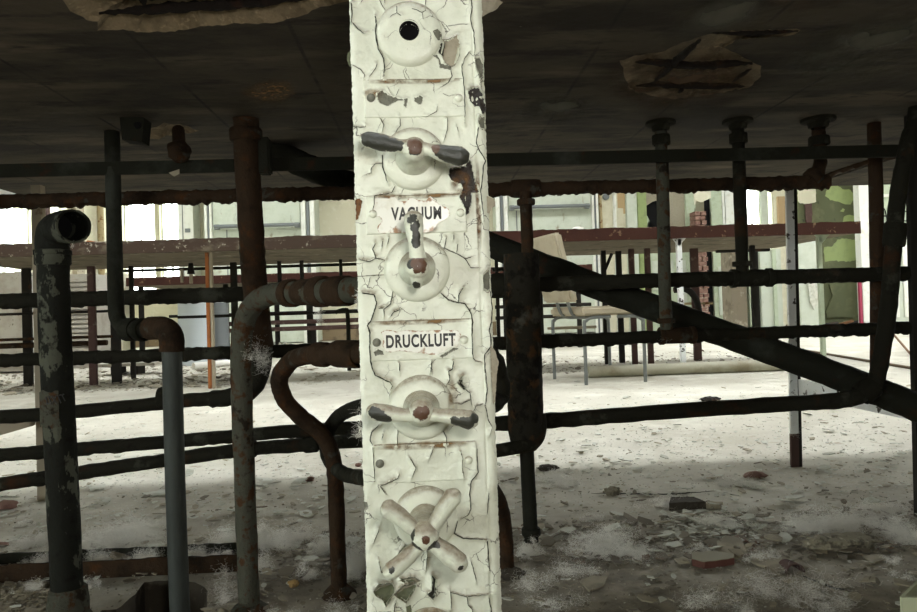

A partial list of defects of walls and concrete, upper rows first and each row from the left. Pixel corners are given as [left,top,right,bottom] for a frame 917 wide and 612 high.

spalling [63,0,349,33]
peeling [432,29,460,69]
peeling [475,56,483,81]
peeling [377,91,423,107]
crack [358,239,400,389]
crack [430,238,493,431]
peeling [490,345,499,405]
crack [370,425,492,612]
peeling [374,577,420,612]